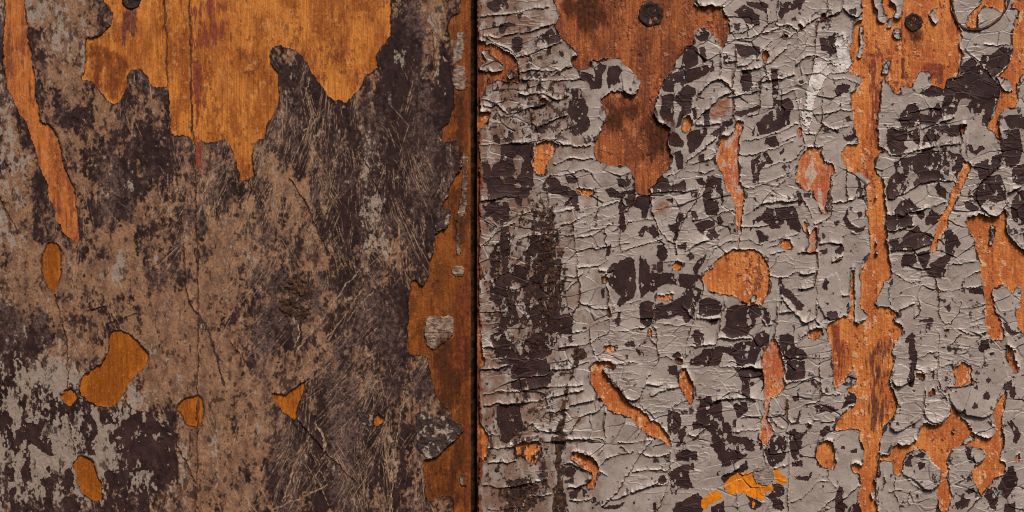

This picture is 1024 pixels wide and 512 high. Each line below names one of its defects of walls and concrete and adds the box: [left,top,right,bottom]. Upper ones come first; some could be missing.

peeling [3,0,80,292]
peeling [81,0,392,181]
peeling [407,0,1024,512]
crack [480,0,1023,512]
spalling [0,329,179,512]